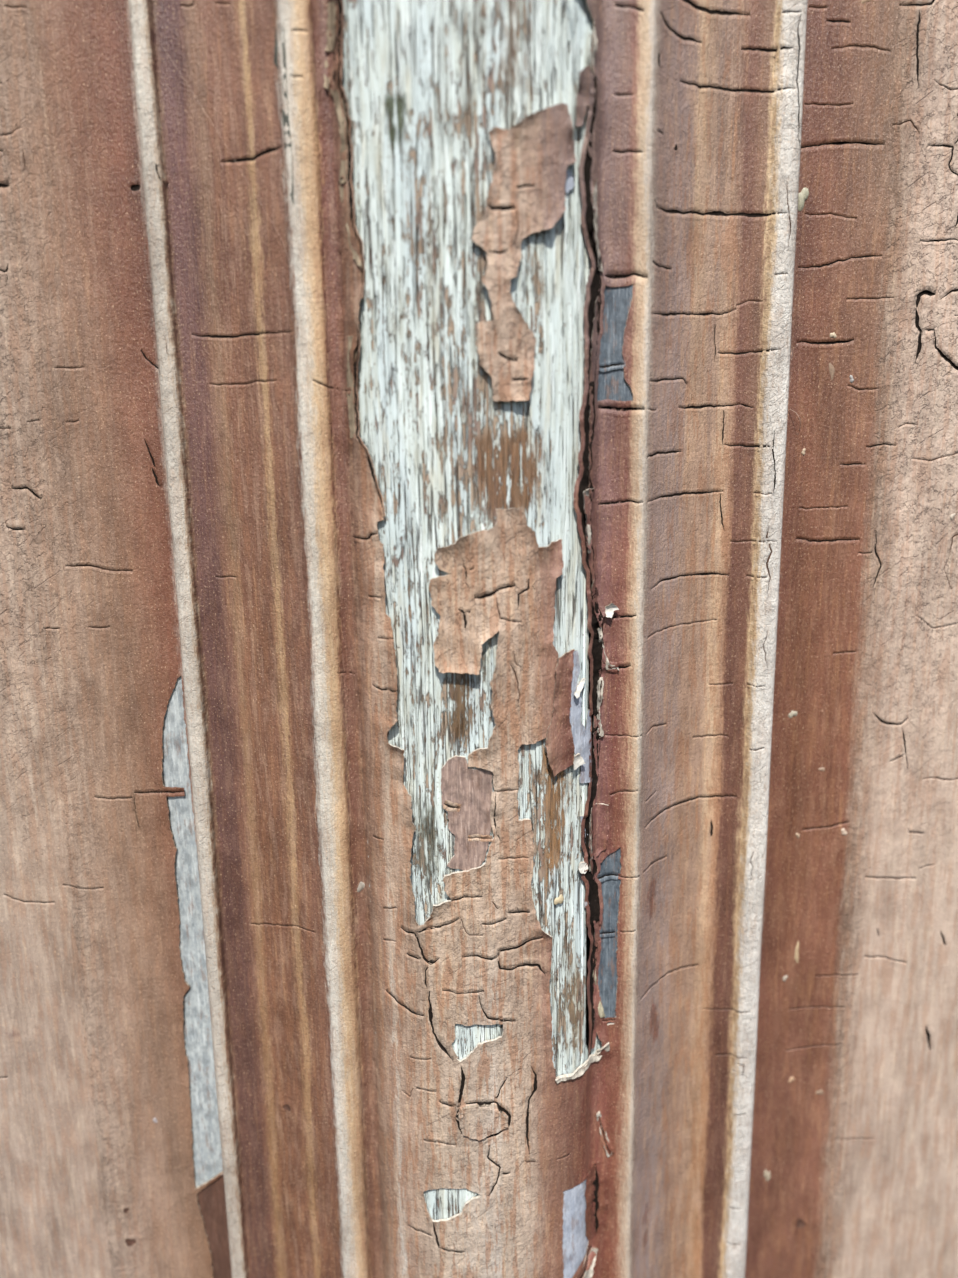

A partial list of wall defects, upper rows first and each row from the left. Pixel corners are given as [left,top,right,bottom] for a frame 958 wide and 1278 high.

crack [0,125,29,200]
crack [129,164,168,198]
crack [0,417,80,432]
crack [4,482,44,535]
crack [65,561,133,575]
peeling [324,0,633,1083]
crack [573,0,958,1057]
crack [43,624,110,632]
crack [443,787,529,862]
peeling [163,676,232,1278]
crack [383,892,615,1278]
peeling [562,1178,598,1278]